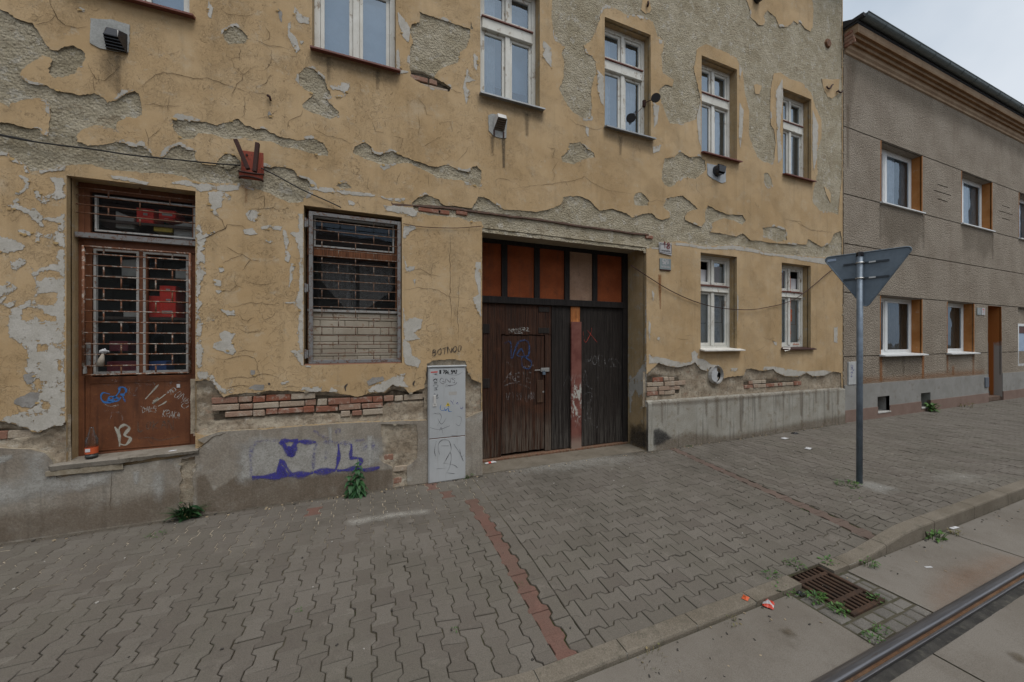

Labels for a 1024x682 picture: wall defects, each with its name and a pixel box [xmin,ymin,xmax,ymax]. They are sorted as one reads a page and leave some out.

flaking render [0,0,843,488]